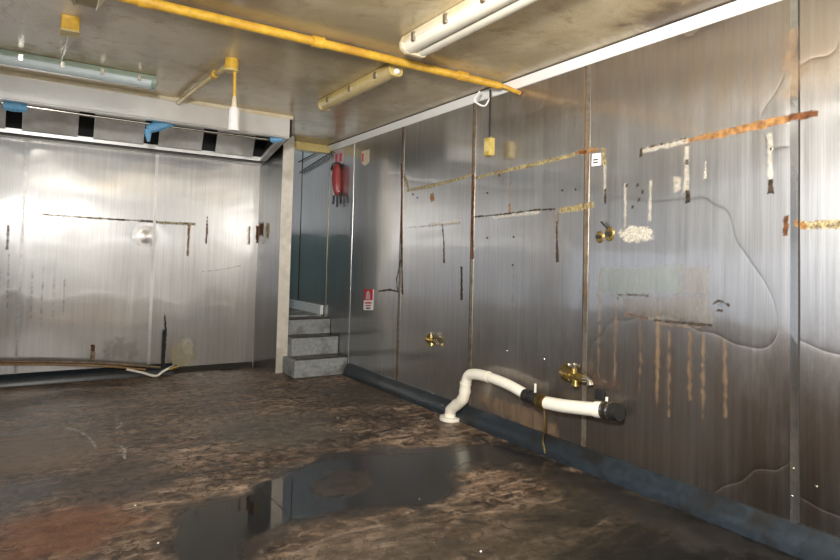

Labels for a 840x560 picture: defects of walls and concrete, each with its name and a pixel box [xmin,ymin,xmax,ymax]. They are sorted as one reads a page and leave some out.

rust [639,110,818,157]
rust [379,106,607,295]
rust [783,215,840,236]
damp [157,435,799,560]